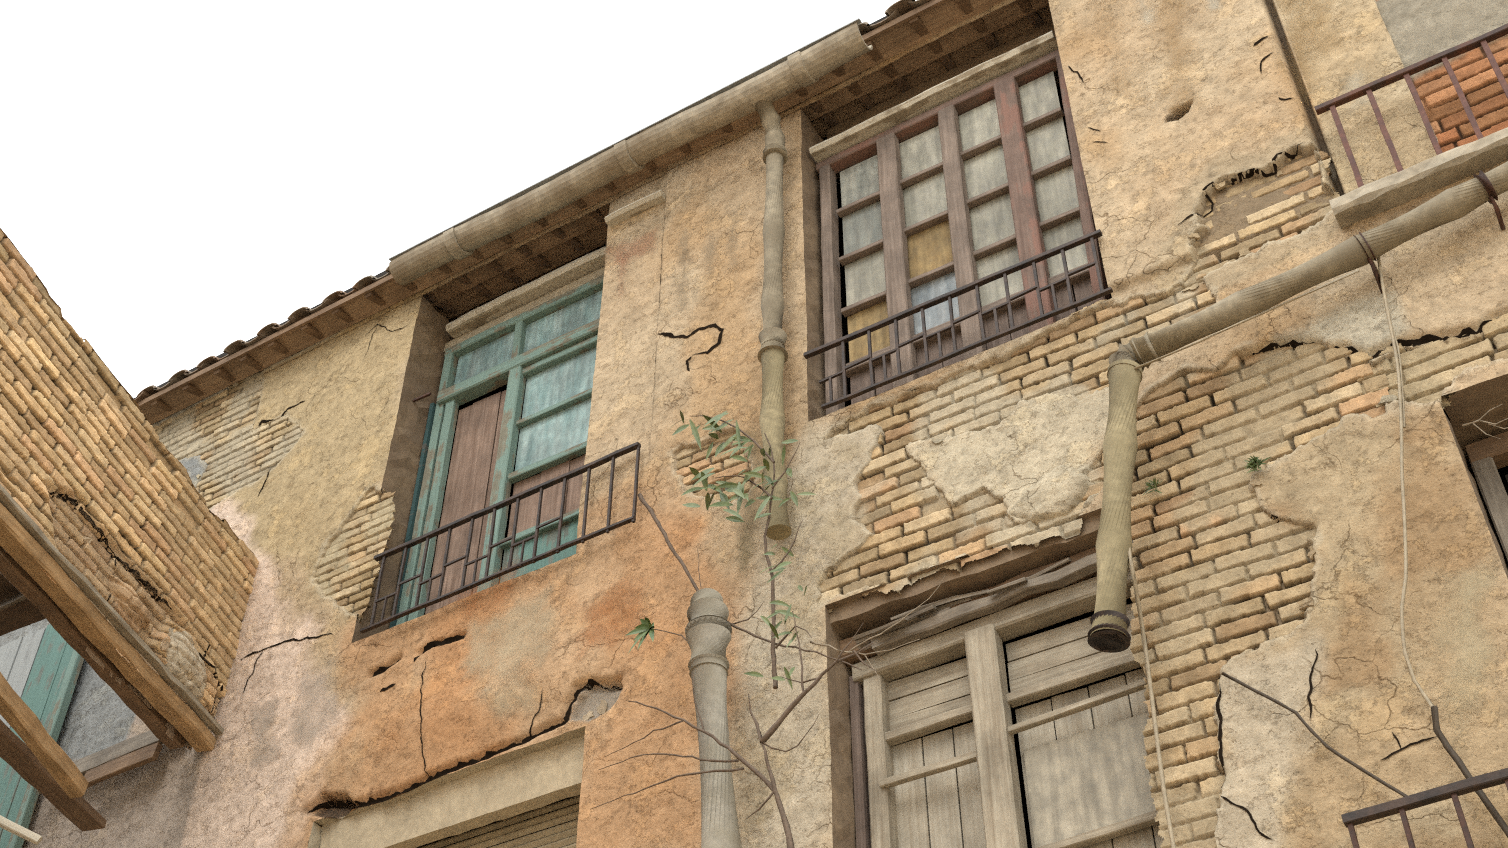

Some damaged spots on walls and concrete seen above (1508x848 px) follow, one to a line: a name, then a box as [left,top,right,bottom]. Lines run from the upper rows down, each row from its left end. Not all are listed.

crack [650,229,724,434]
spalling [818,149,1340,613]
crack [1252,320,1496,362]
crack [49,492,172,610]
spalling [315,488,396,621]
crack [308,635,623,813]
crack [1216,678,1273,840]
crack [1307,649,1318,718]
crack [1381,732,1437,760]